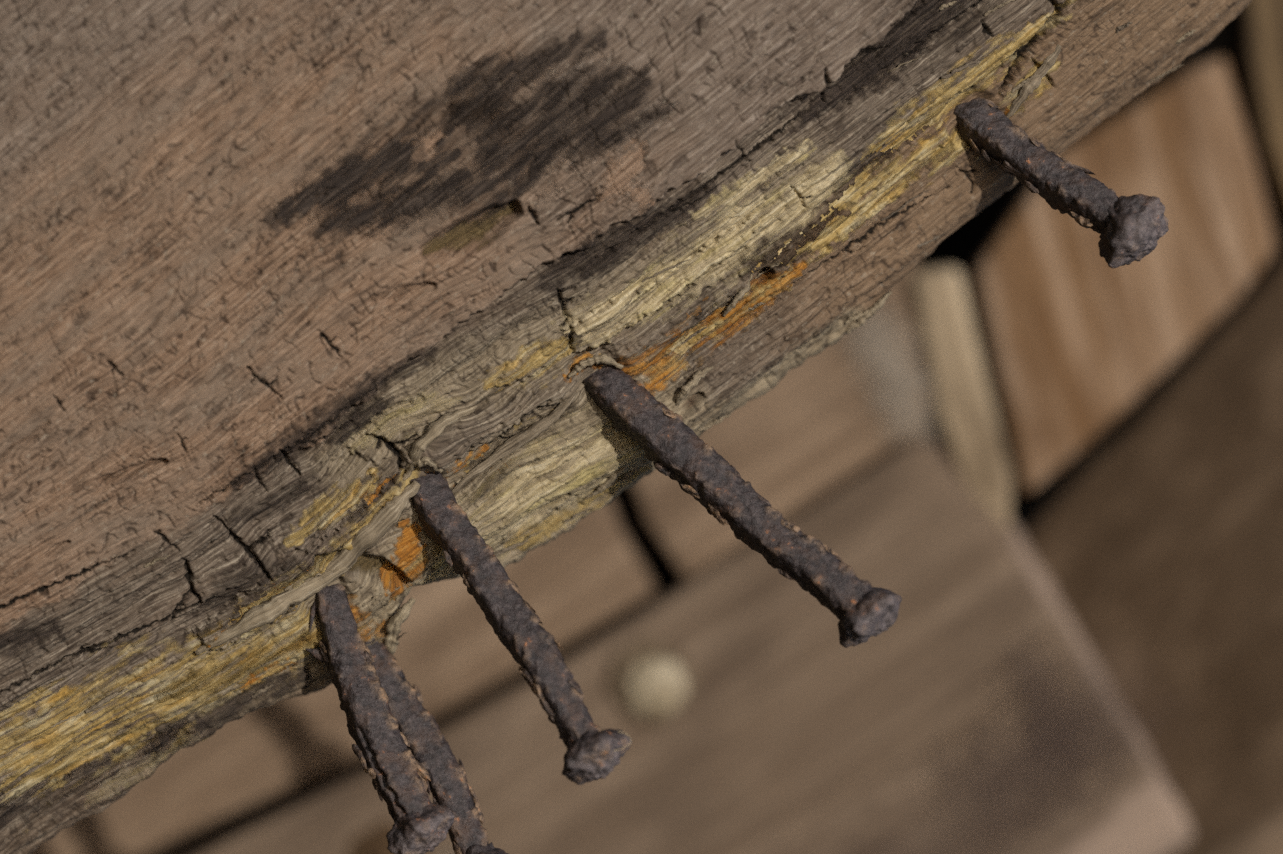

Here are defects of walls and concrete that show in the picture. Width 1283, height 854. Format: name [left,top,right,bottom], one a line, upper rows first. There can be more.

crack [635,0,1071,232]
crack [528,194,600,223]
crack [792,166,975,283]
corrosion [1071,212,1094,228]
crack [557,289,572,343]
corrosion [563,261,807,419]
crack [246,366,282,398]
crack [199,400,416,578]
corrosion [653,462,729,525]
corrosion [380,517,471,601]
corrosion [519,667,555,722]
corrosion [352,744,383,801]